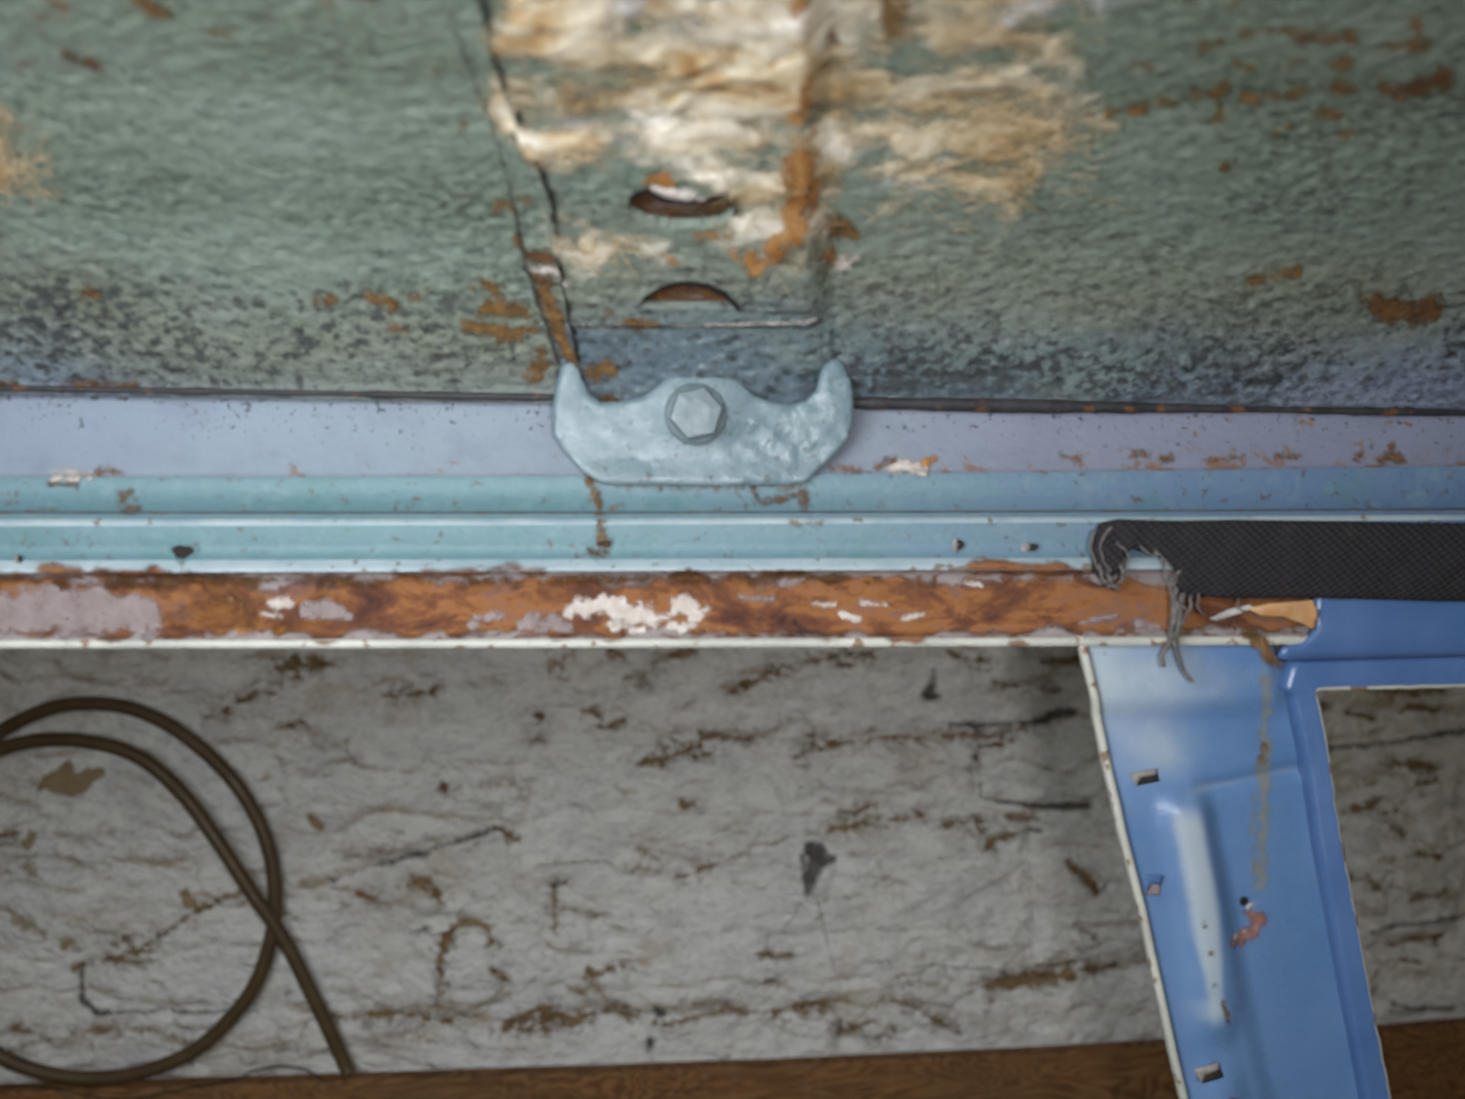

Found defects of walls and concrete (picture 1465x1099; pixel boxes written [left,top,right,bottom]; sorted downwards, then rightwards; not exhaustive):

rust [789,0,810,25]
rust [879,0,910,41]
crack [446,0,817,381]
peeling [650,185,704,202]
rust [631,74,860,276]
rust [1365,292,1446,326]
peeling [0,584,161,637]
peeling [261,597,353,621]
peeling [815,600,887,623]
peeling [1210,600,1318,630]
peeling [467,593,708,688]
rust [1230,904,1266,947]